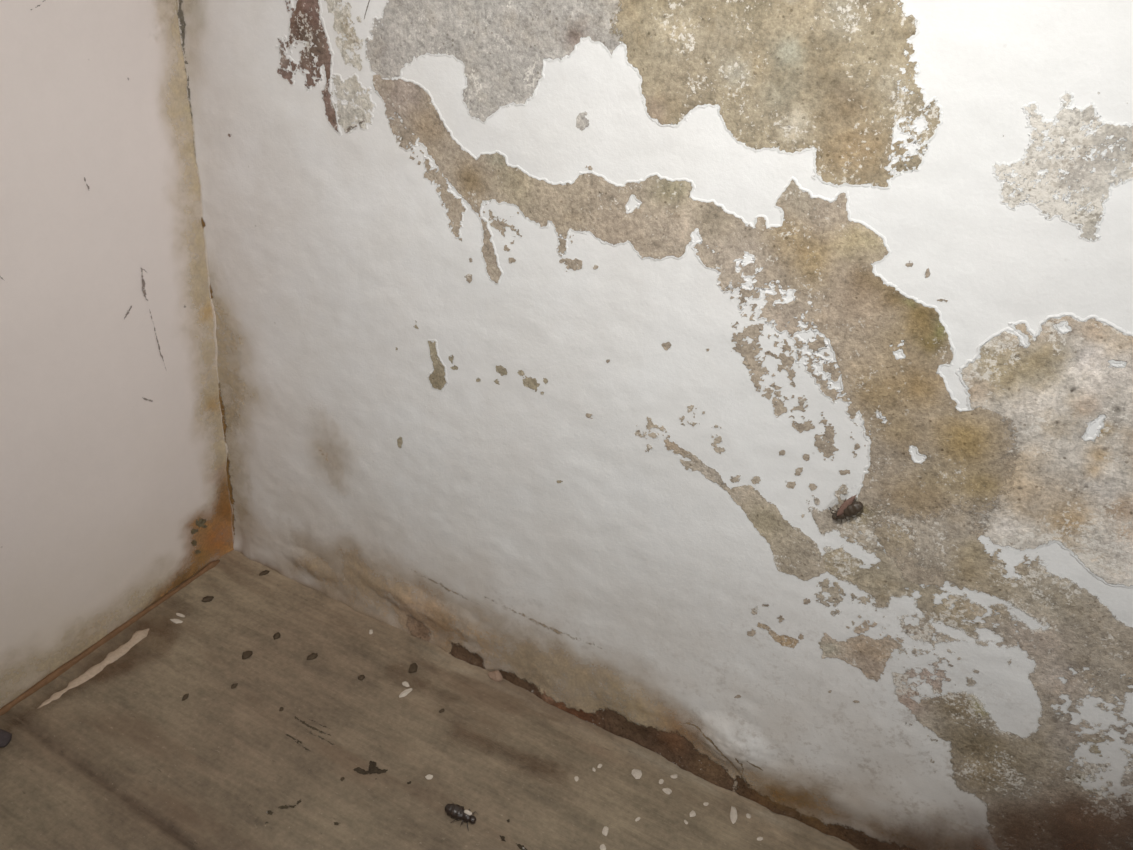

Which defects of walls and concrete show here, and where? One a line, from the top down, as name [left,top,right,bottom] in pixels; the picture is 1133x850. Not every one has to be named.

leakage [168,9,200,200]
leakage [191,518,207,554]
leakage [188,223,245,484]
peeling [275,0,1133,850]
leakage [301,548,771,789]